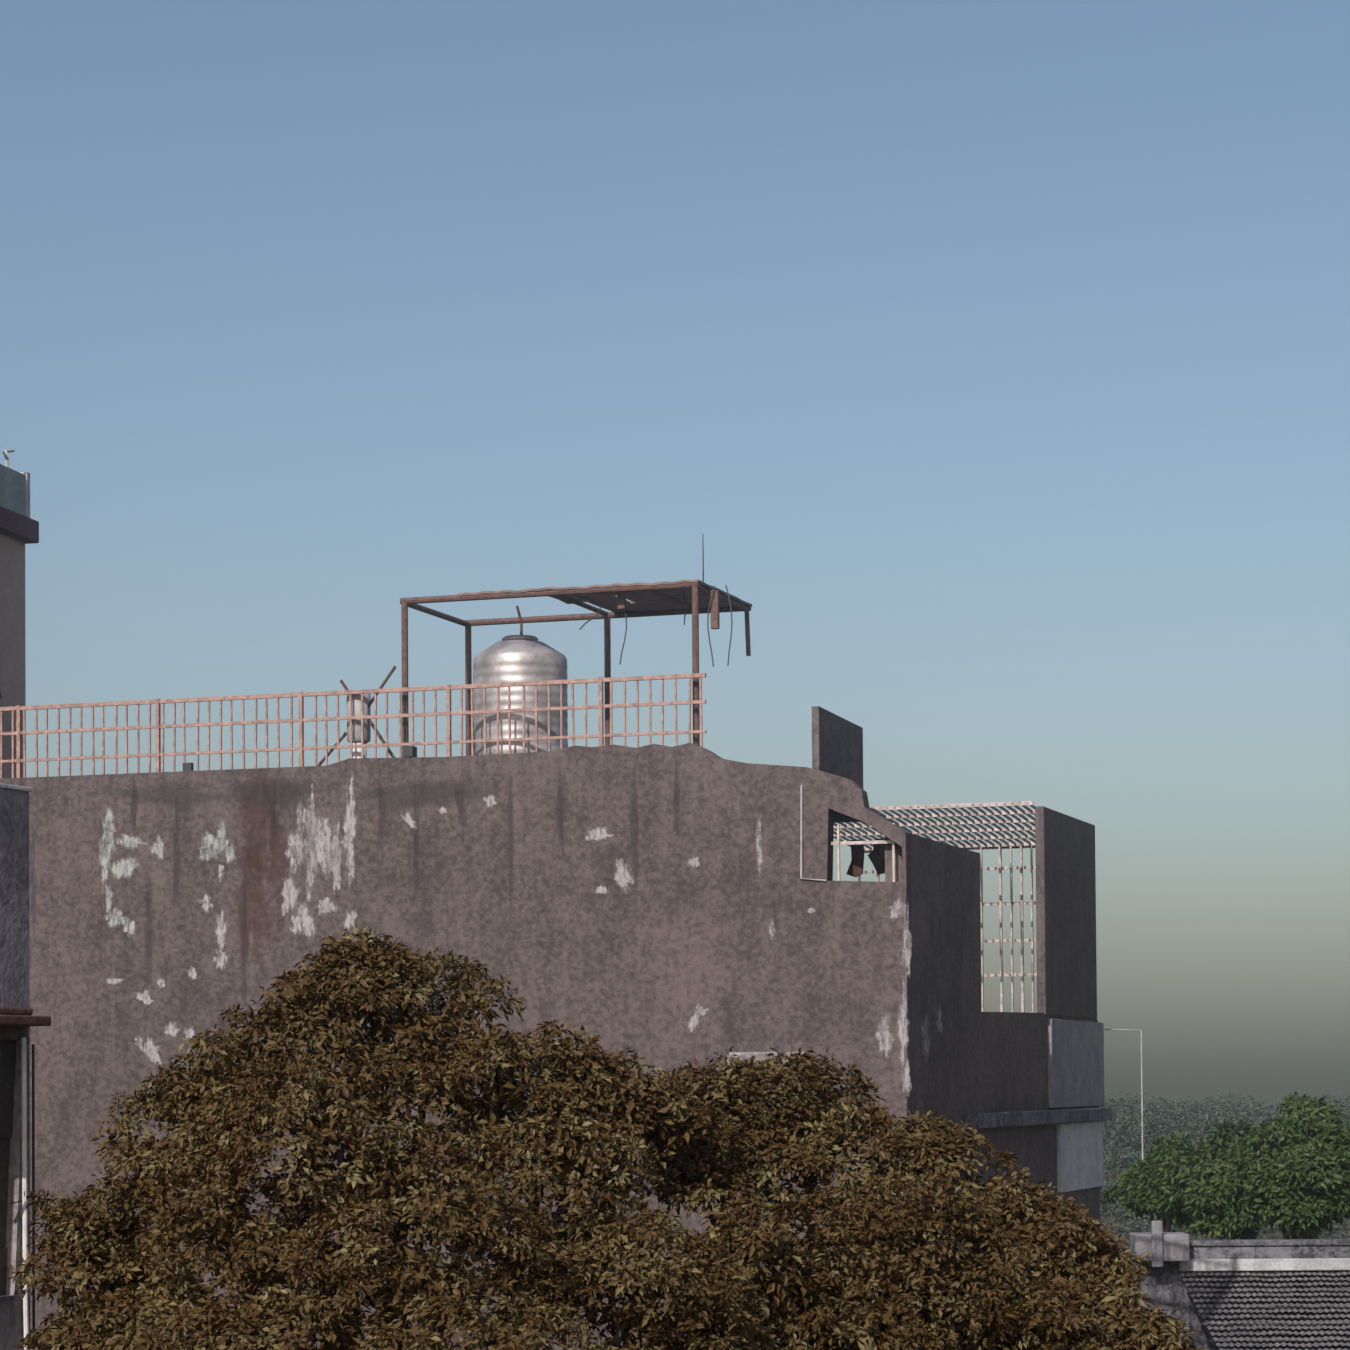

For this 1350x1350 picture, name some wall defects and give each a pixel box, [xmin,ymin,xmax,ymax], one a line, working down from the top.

peeling [99,809,164,934]
peeling [198,822,235,879]
peeling [282,777,357,936]
peeling [200,894,228,969]
peeling [137,979,165,1004]
peeling [135,1023,194,1064]